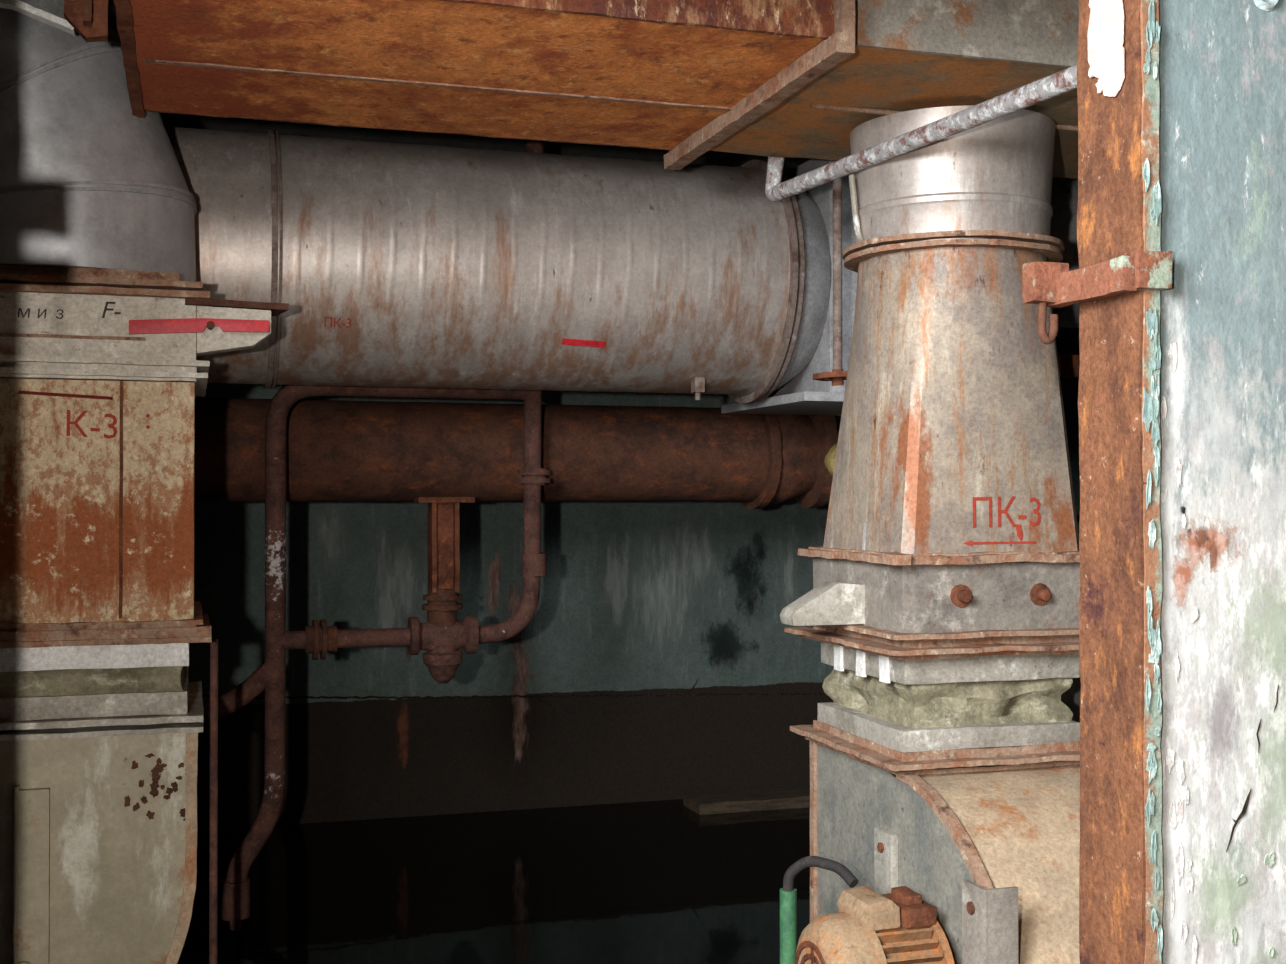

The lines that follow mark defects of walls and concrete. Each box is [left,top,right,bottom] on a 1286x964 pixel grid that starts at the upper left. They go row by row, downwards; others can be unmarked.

peeling [1088,0,1125,97]
peeling [1143,0,1160,80]
peeling [1143,158,1161,225]
water stain [604,529,794,647]
corrosion [1172,528,1238,606]
water stain [706,624,756,664]
peeling [1142,300,1199,964]
crack [1256,685,1279,753]
crack [1226,789,1251,852]
peeling [1224,890,1286,964]